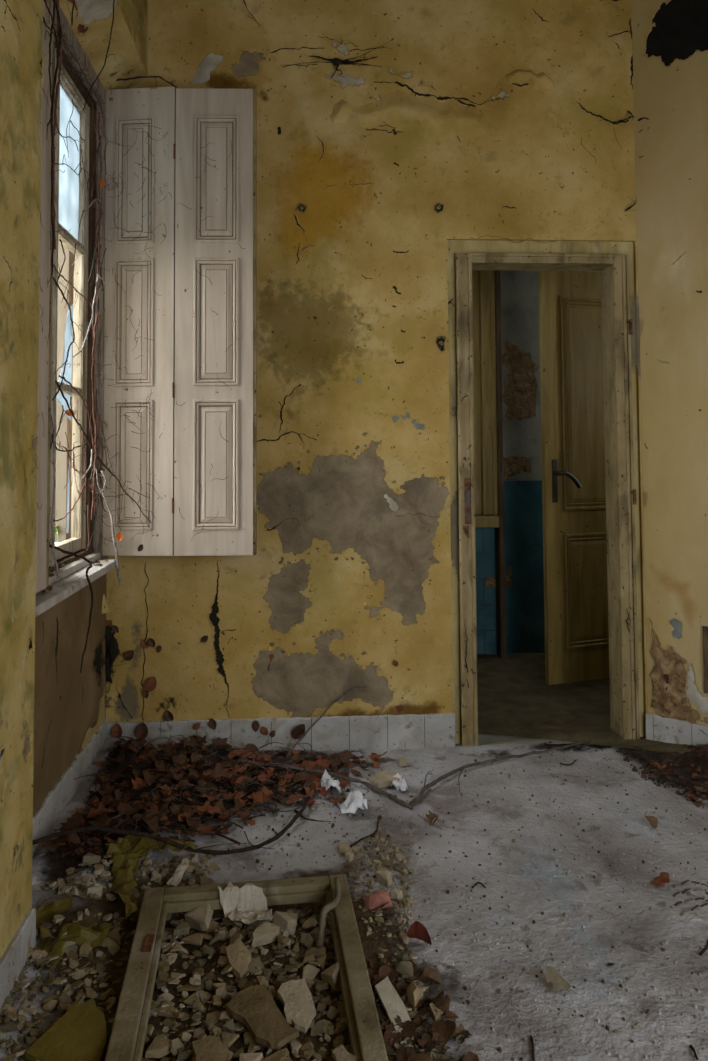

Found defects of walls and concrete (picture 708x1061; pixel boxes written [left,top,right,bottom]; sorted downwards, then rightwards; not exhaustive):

peeling [75,0,119,29]
crack [269,36,385,68]
flaking render [640,0,708,71]
crack [373,71,529,115]
crack [576,101,649,165]
peeling [244,432,450,718]
crack [207,560,236,718]
flaking render [648,613,708,724]